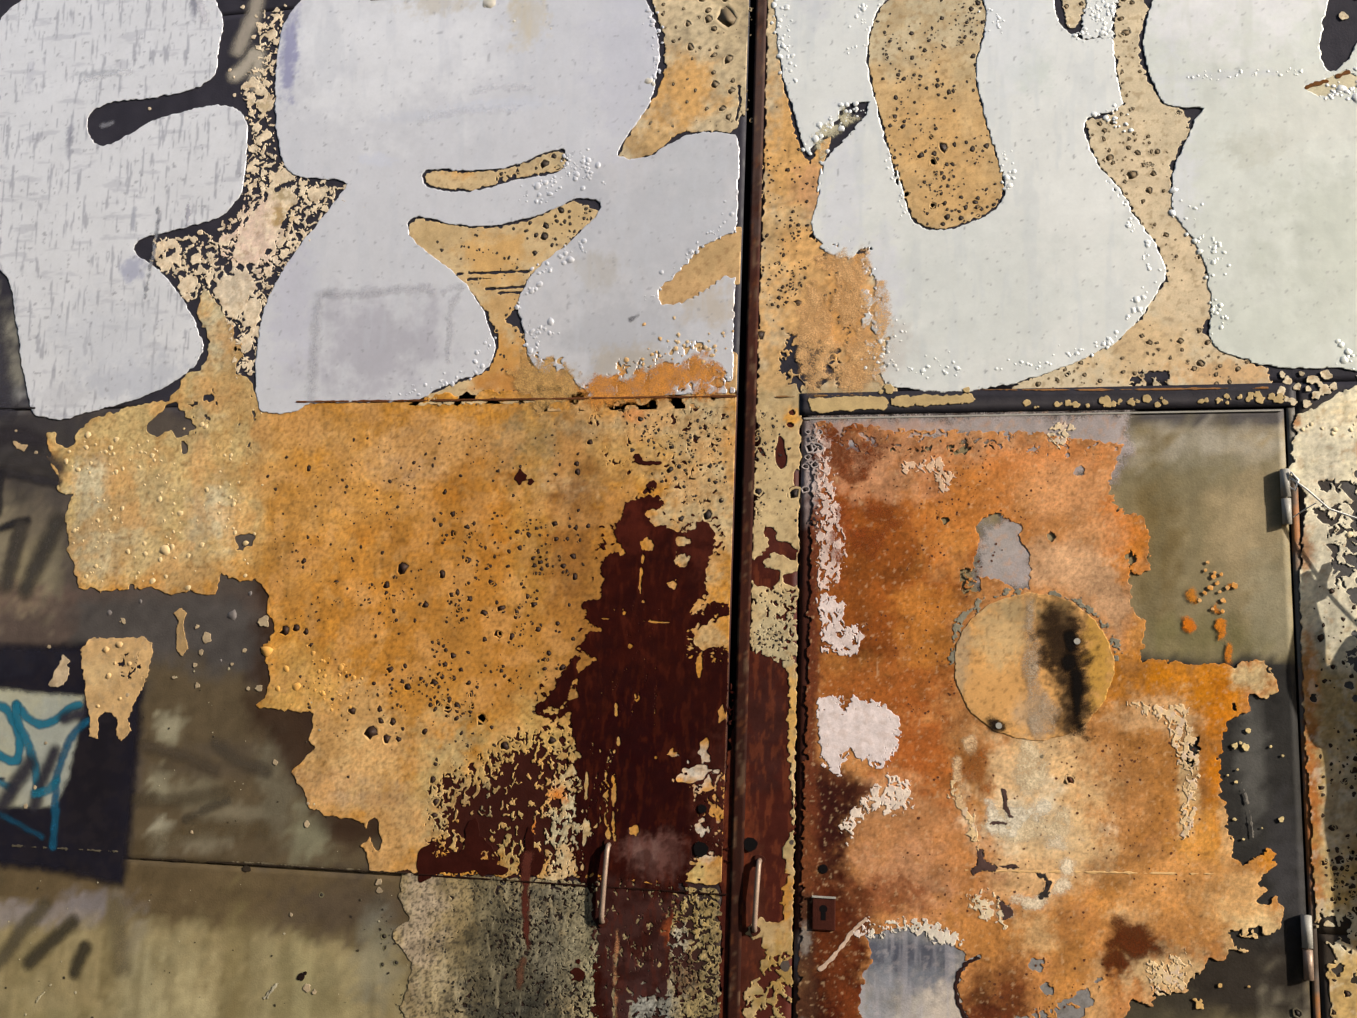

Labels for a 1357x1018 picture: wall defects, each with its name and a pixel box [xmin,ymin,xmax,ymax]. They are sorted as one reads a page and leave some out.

peeling [13,0,749,1018]
rust [379,908,399,975]
rust [425,981,502,1018]
rust [470,851,594,1018]
rust [750,412,1284,1018]
peeling [740,0,1357,1018]